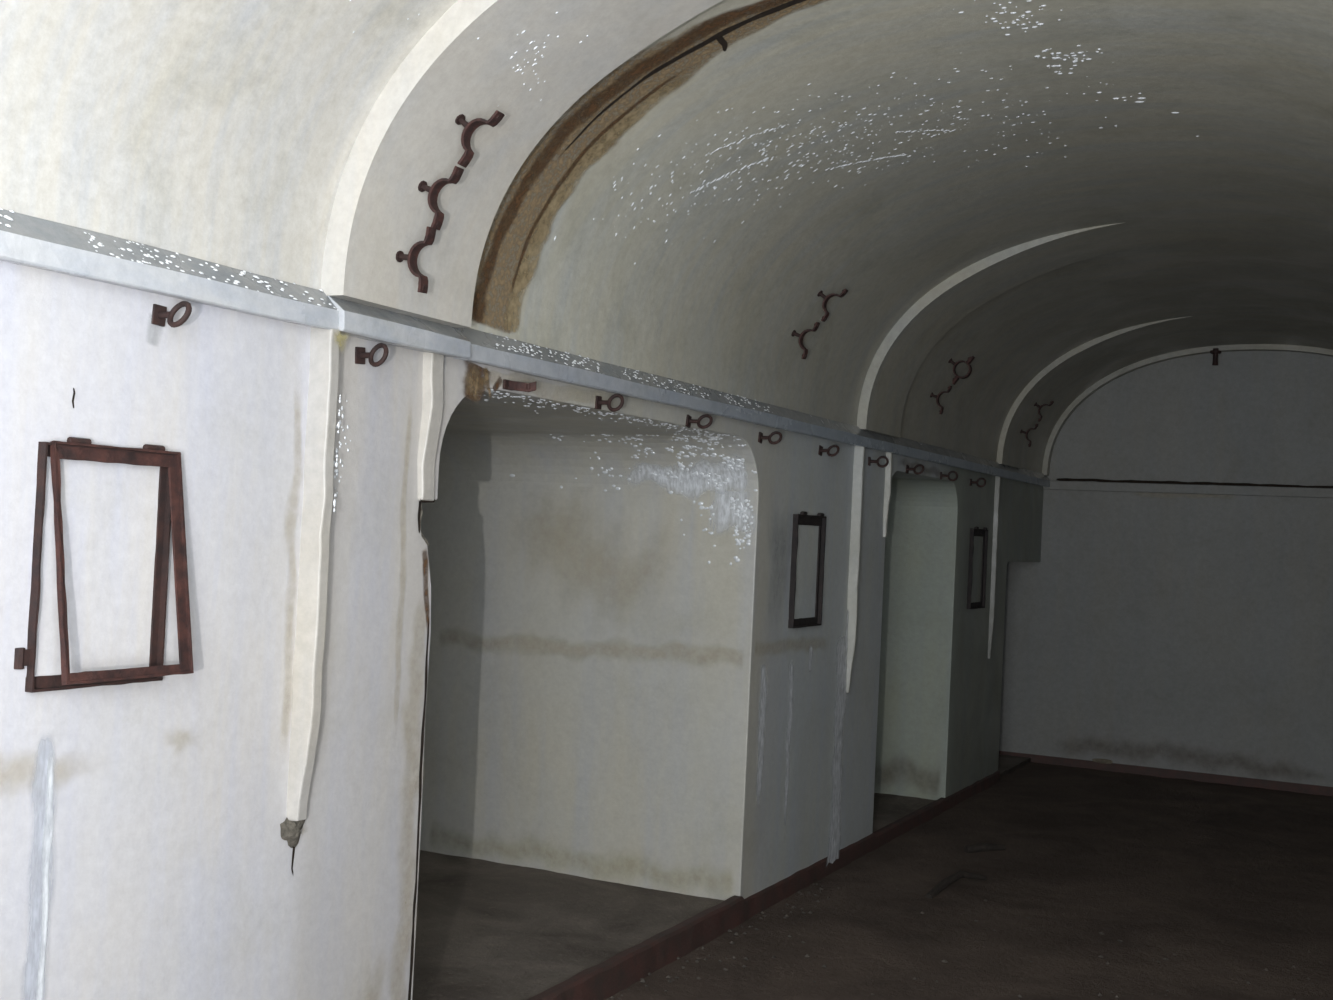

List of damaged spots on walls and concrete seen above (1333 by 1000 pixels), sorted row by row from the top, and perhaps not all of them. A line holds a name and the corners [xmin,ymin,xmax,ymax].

flaking render [280,818,305,874]